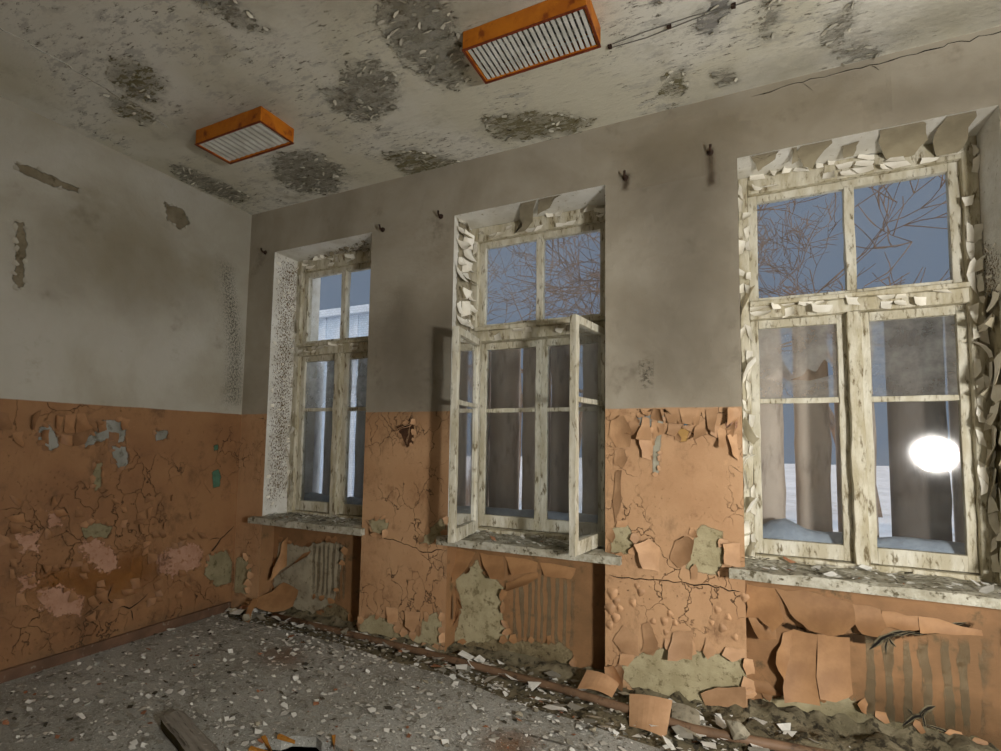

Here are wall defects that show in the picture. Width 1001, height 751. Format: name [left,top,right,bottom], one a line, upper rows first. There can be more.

crack [751,31,1001,97]
peeling [11,219,29,291]
peeling [13,161,82,194]
peeling [163,202,190,230]
peeling [455,195,576,332]
peeling [738,111,981,255]
peeling [0,410,132,491]
peeling [265,239,389,538]
peeling [591,222,1001,594]
peeling [0,495,348,622]
peeling [356,548,577,667]